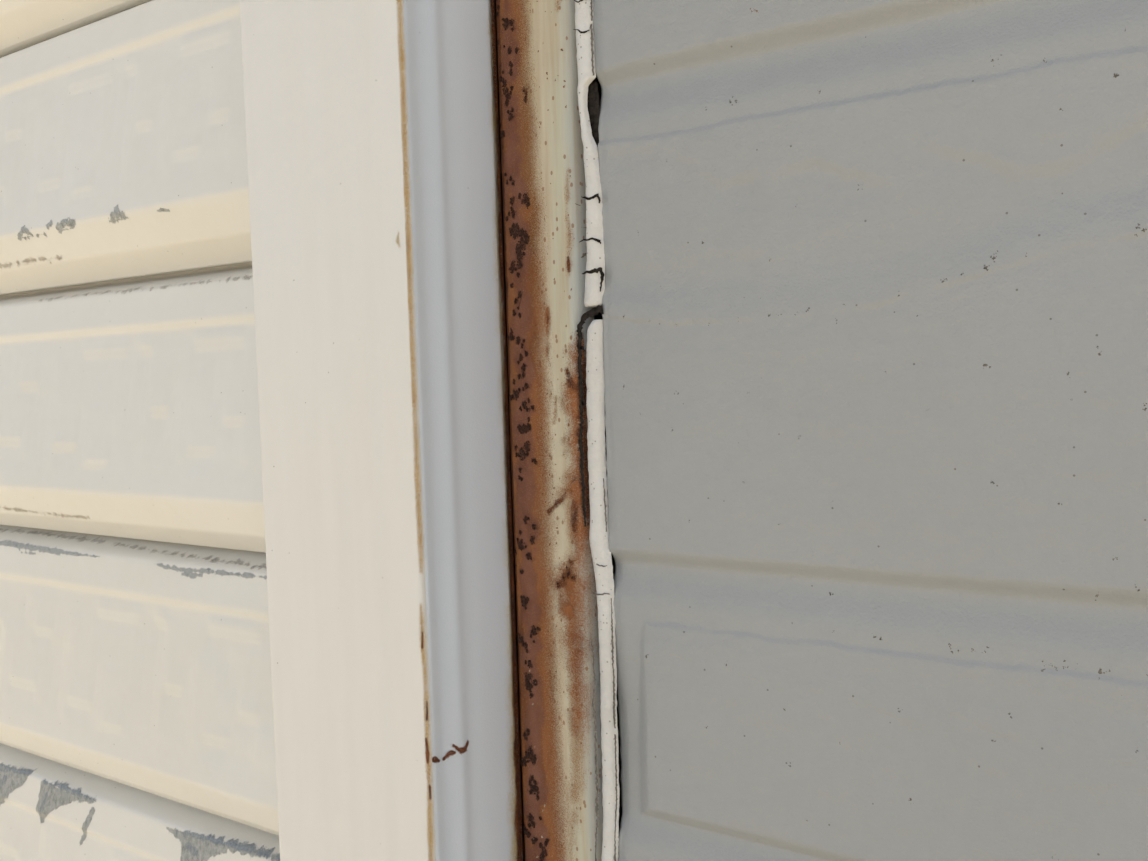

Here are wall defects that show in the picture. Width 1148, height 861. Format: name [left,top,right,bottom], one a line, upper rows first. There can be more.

peeling [17,217,76,241]
peeling [109,205,128,224]
crack [575,193,607,532]
rust [490,0,601,861]
peeling [0,540,98,558]
peeling [157,563,267,580]
crack [591,564,617,861]
peeling [0,762,96,845]
peeling [167,827,280,861]